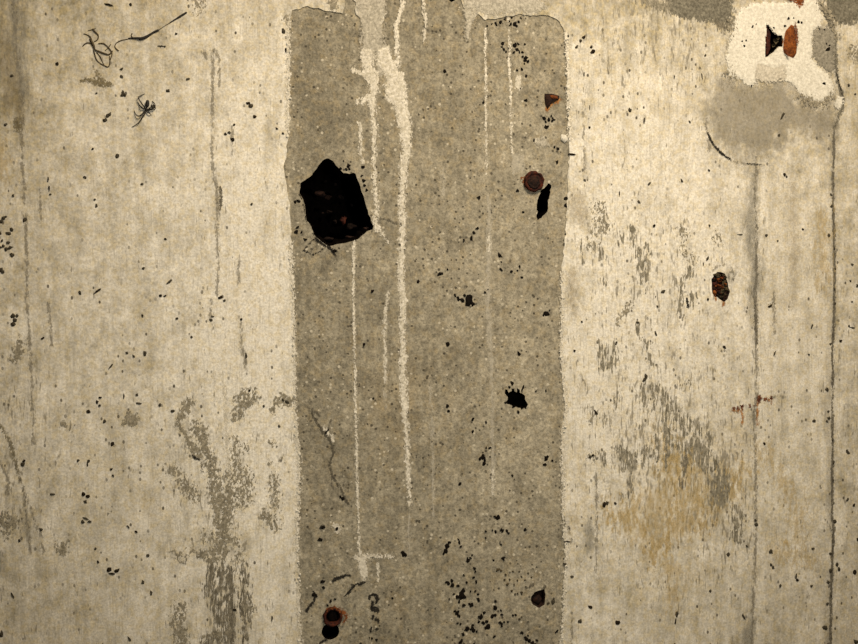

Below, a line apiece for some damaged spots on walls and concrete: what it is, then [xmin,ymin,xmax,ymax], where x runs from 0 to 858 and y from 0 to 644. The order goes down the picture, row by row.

peeling [227,387,262,422]
efflorescence [351,240,395,582]
efflorescence [351,0,413,506]
peeling [269,0,569,644]
rust [711,272,730,306]